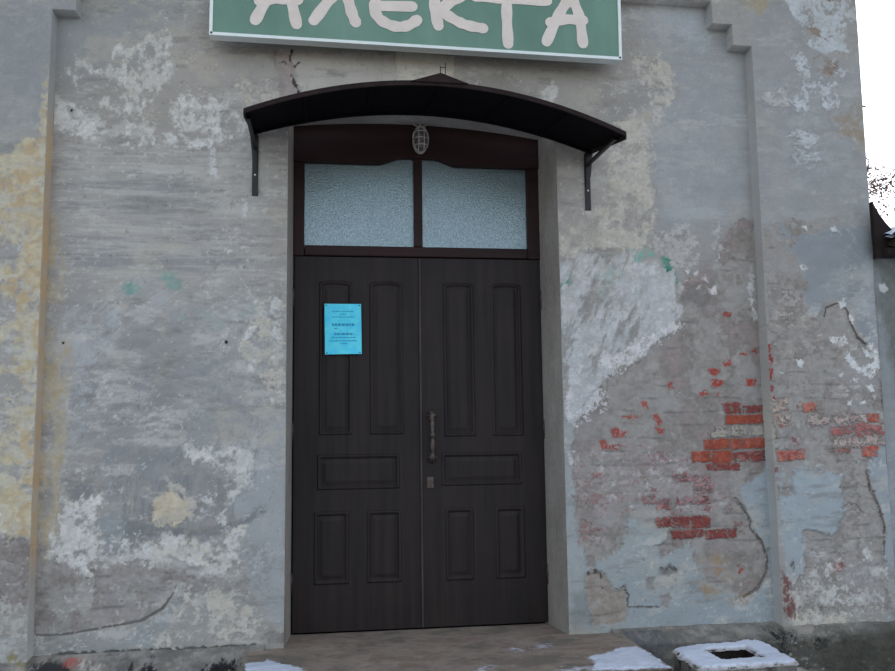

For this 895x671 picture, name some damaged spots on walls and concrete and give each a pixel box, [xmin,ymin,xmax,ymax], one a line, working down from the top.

peeling [760,0,856,113]
flaking render [0,22,298,650]
flaking render [559,50,893,631]
crack [823,302,868,346]
crack [36,583,258,655]
leakage [760,624,819,656]
leakage [25,657,73,671]
leakage [126,654,159,671]
leakage [190,656,242,671]